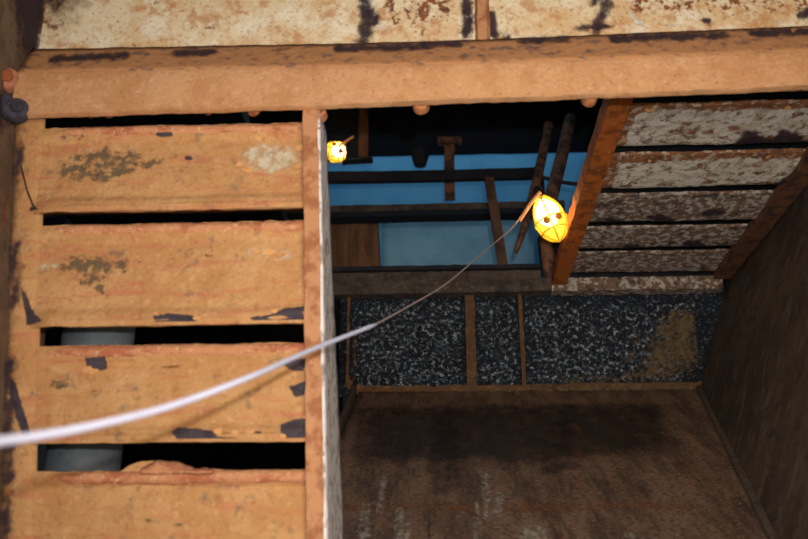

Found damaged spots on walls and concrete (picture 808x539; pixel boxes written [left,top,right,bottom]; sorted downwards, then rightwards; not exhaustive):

corrosion [333,0,474,52]
corrosion [489,11,570,44]
corrosion [576,0,784,43]
corrosion [749,0,808,37]
peeling [236,136,303,174]
water stain [526,302,694,380]
water stain [364,404,662,479]